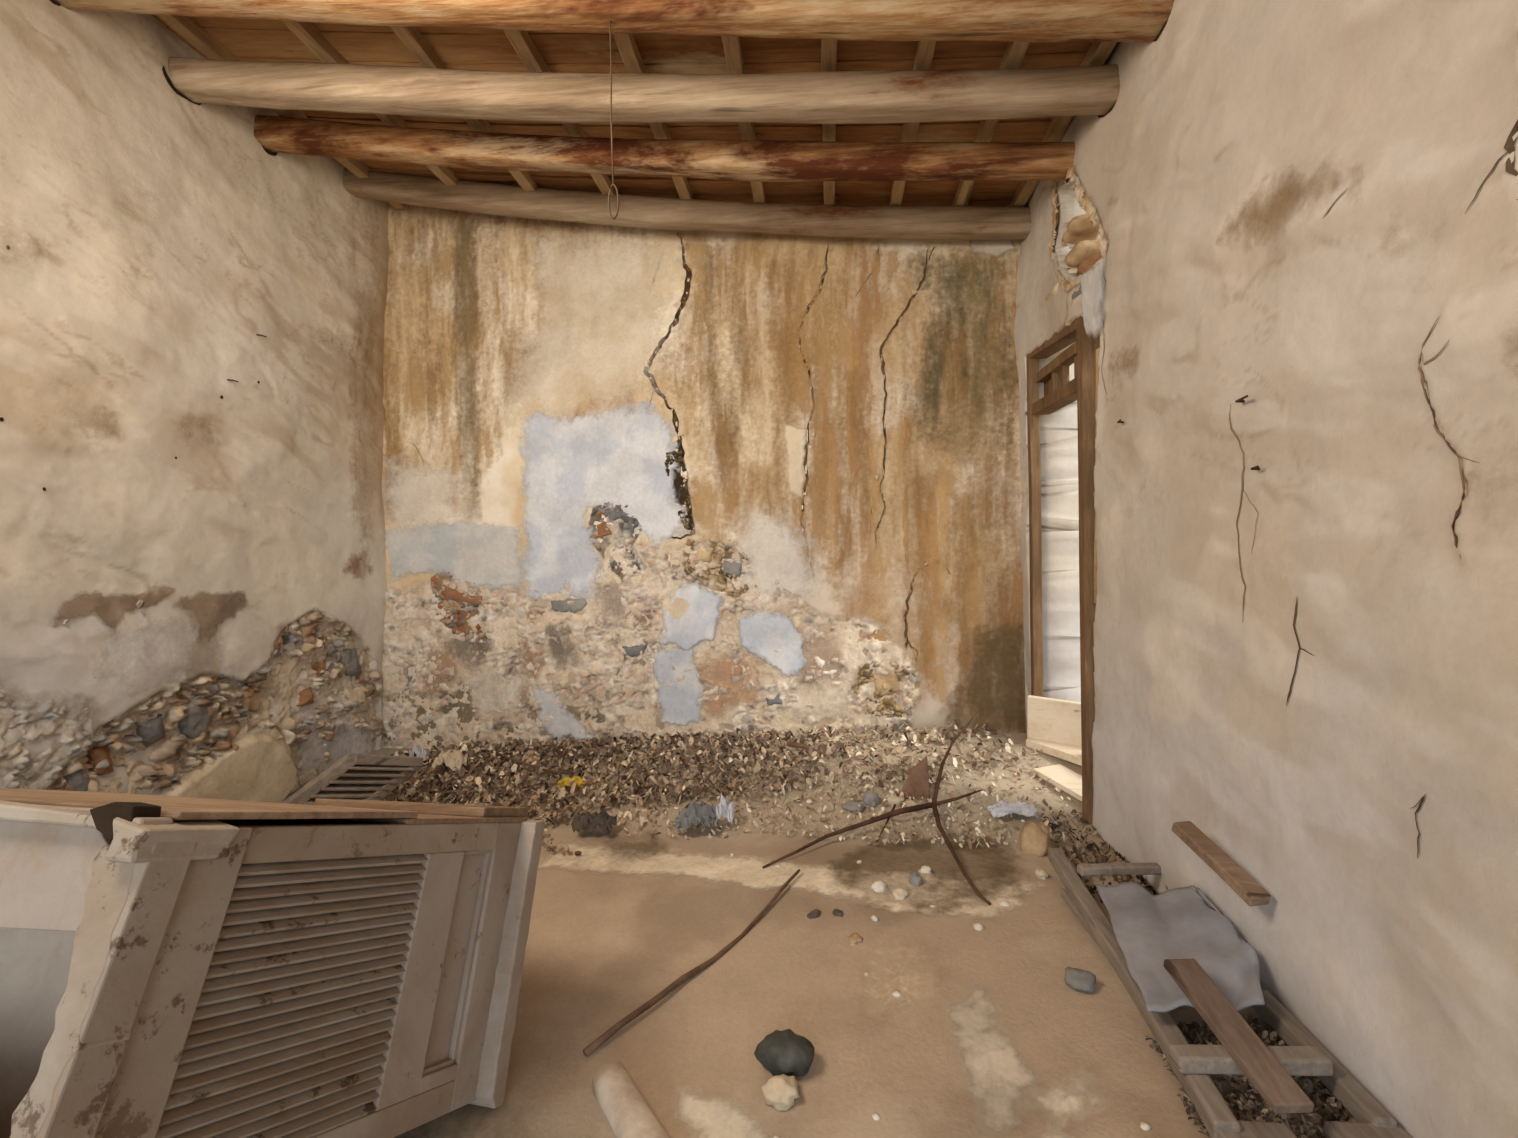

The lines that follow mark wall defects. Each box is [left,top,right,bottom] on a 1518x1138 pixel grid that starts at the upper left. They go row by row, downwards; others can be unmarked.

crack [1465,120,1518,214]
water stain [356,212,543,514]
spalling [0,502,923,794]
crack [643,233,695,539]
crack [799,247,879,577]
water stain [684,239,1026,733]
crack [870,247,935,547]
crack [1229,404,1258,622]
crack [1286,599,1313,706]
crack [1418,317,1476,558]